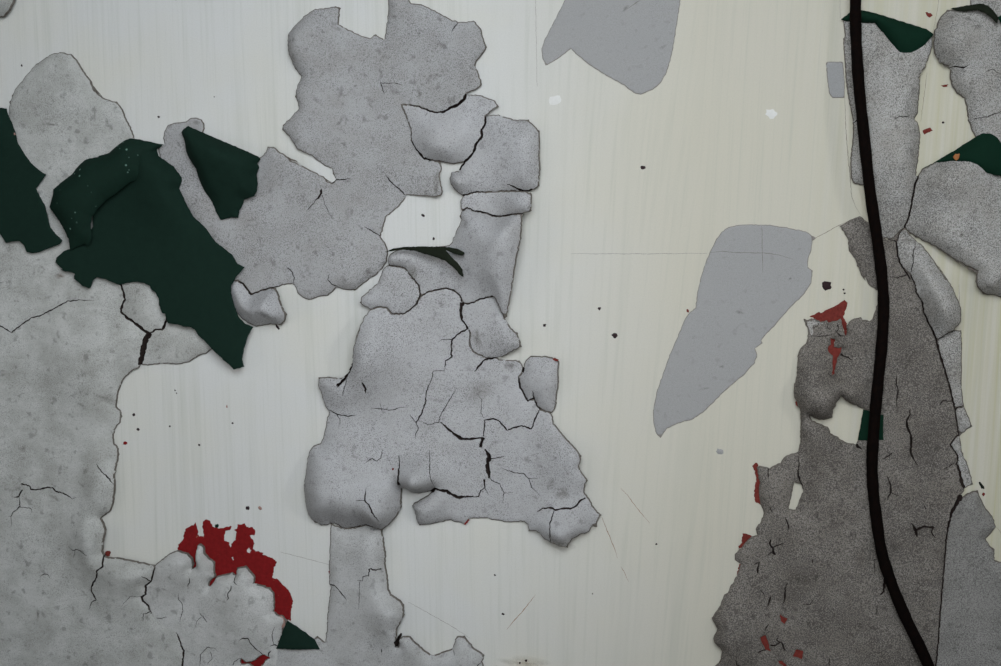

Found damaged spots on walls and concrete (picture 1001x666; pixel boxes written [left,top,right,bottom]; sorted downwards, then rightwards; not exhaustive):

crack [380,82,467,161]
crack [459,116,486,170]
crack [462,184,532,217]
crack [0,299,93,333]
crack [120,284,167,365]
peeling [0,0,601,666]
peeling [712,9,1001,666]
crack [330,273,586,542]
crack [855,376,918,500]
crack [888,176,965,666]
crack [123,568,277,666]
crack [381,633,402,653]